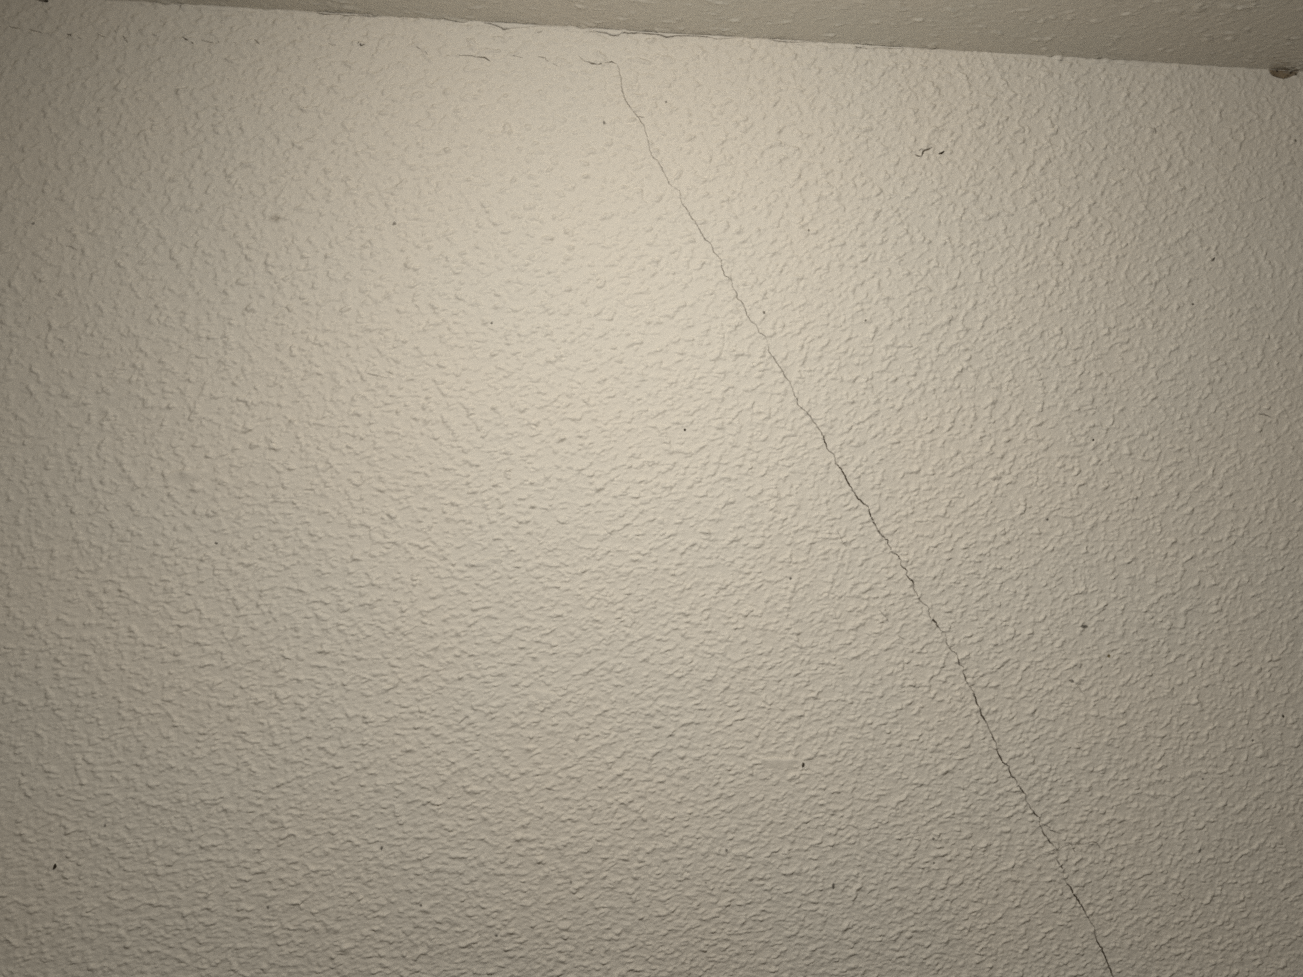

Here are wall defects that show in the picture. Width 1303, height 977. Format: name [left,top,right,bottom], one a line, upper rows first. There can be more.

crack [823,436,914,584]
crack [958,659,1113,976]